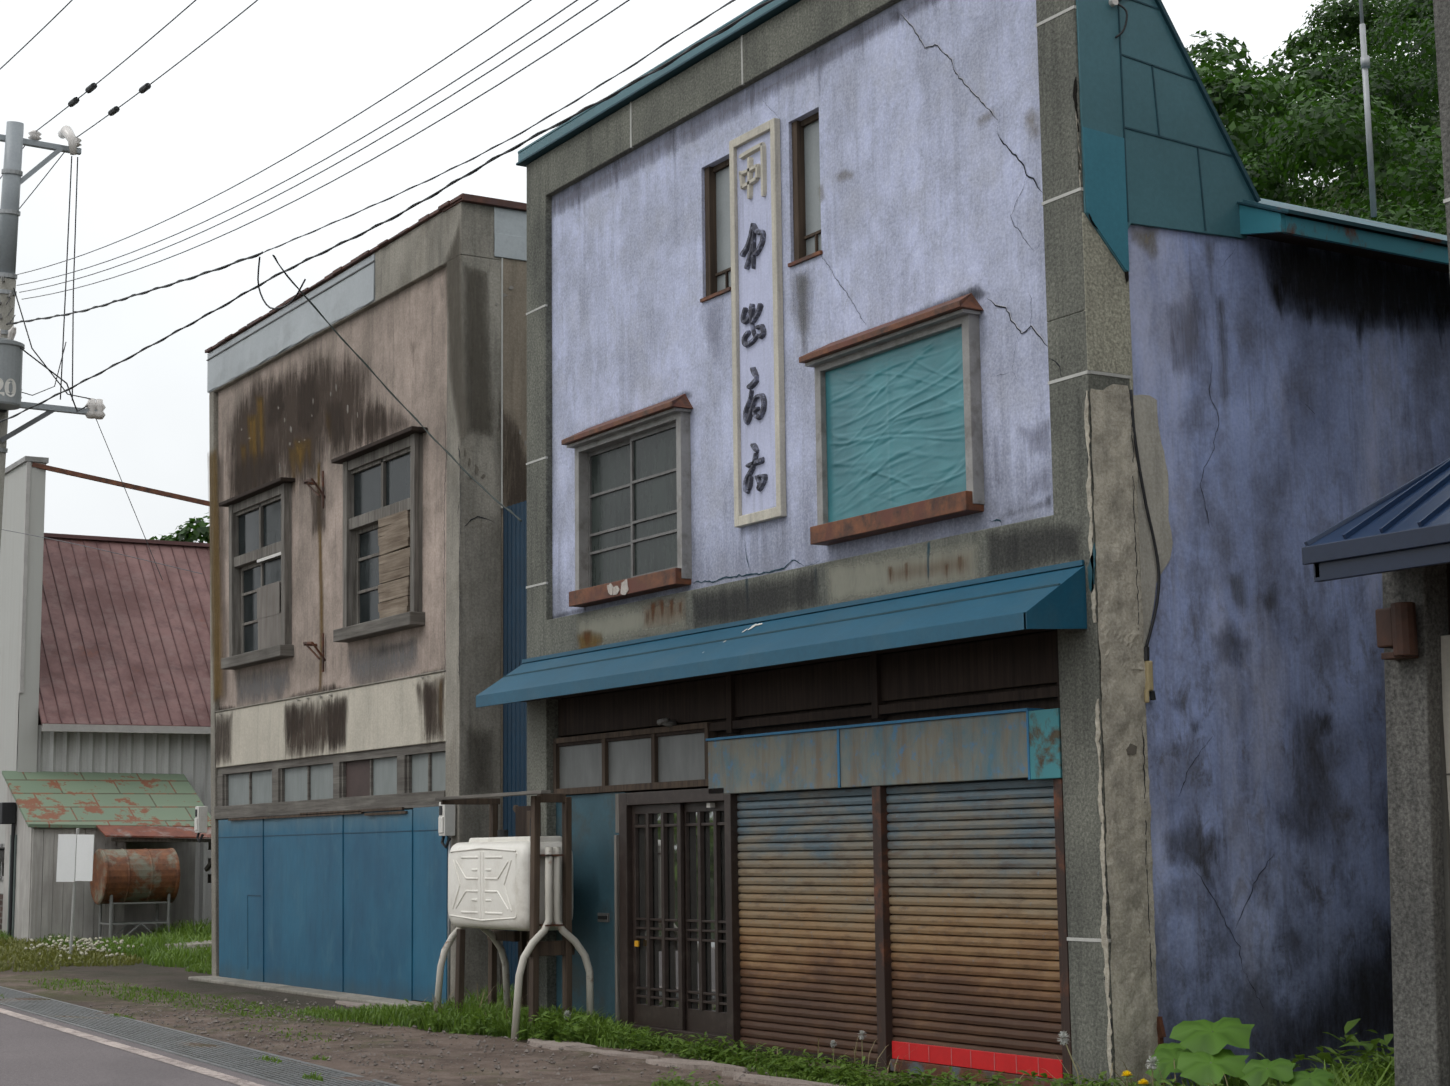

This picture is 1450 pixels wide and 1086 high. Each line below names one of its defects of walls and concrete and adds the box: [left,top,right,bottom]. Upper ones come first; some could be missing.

crack [902,14,1043,252]
crack [988,294,1086,398]
water stain [230,358,401,496]
water stain [285,686,346,756]
water stain [1284,934,1394,1051]